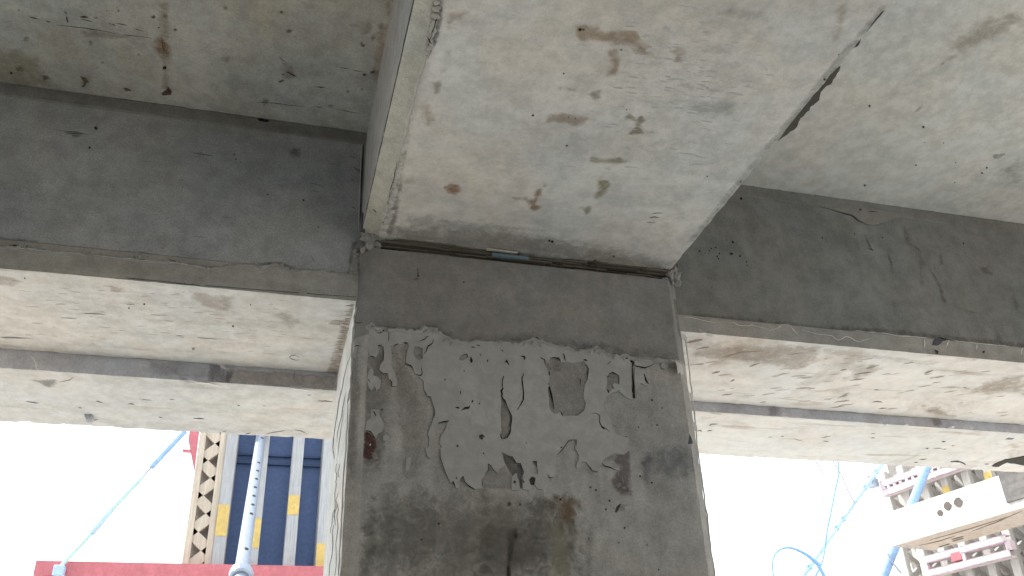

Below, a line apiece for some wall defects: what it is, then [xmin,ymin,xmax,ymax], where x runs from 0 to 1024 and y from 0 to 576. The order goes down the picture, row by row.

corrosion [363,432,377,459]
peeling [338,307,716,576]